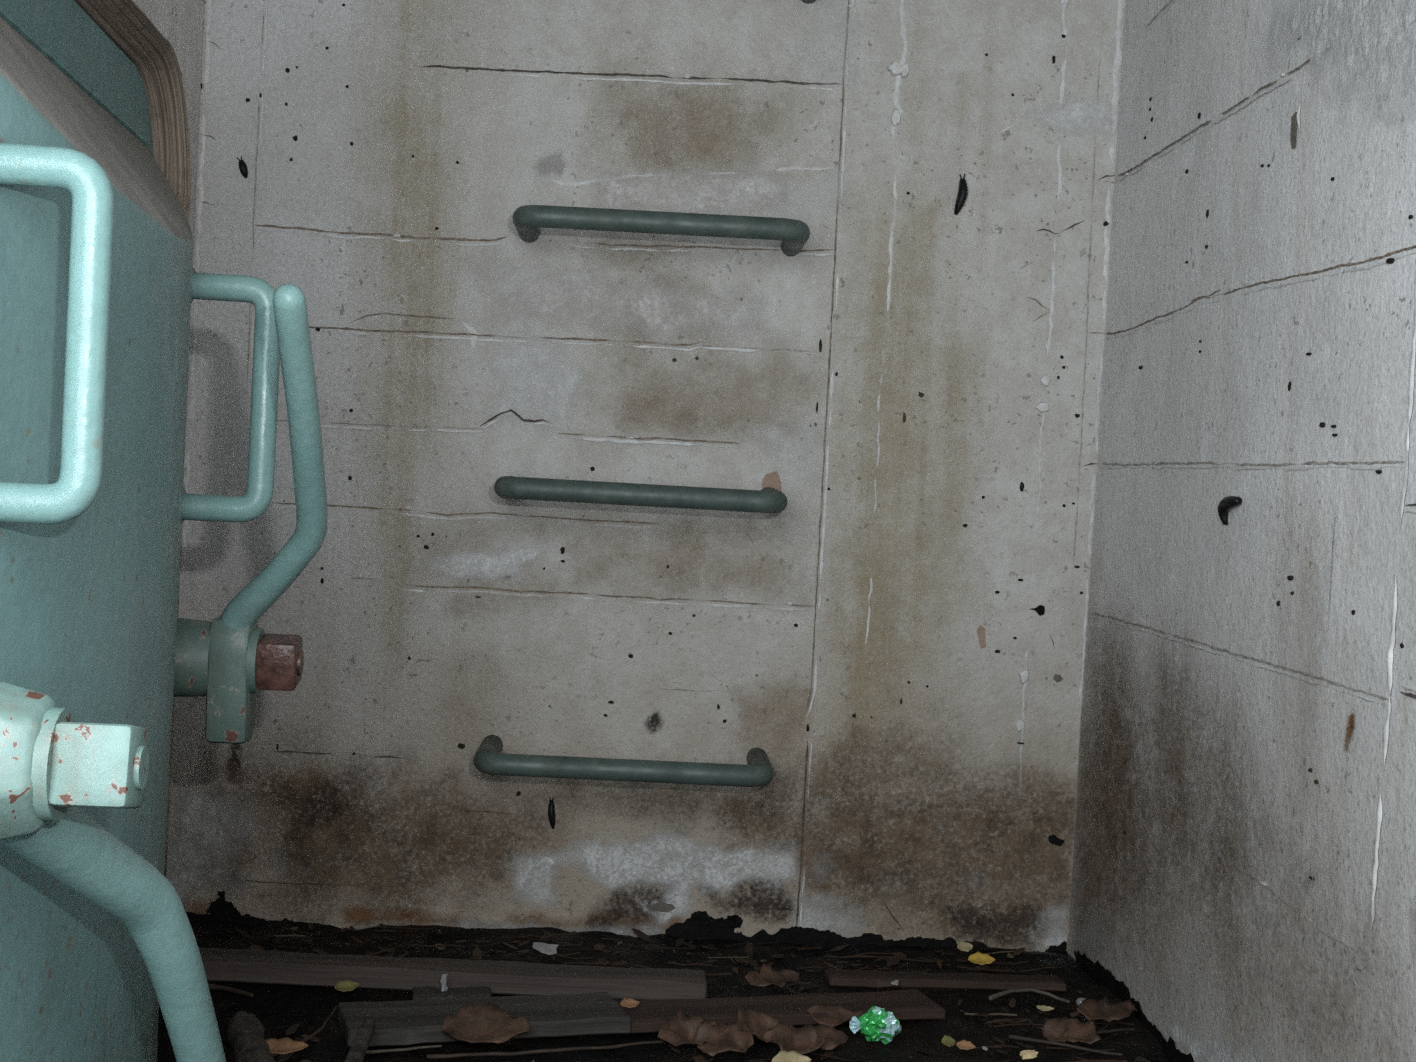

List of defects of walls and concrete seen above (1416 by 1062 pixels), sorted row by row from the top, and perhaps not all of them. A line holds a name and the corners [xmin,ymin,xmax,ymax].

leakage [165,696,1267,1062]